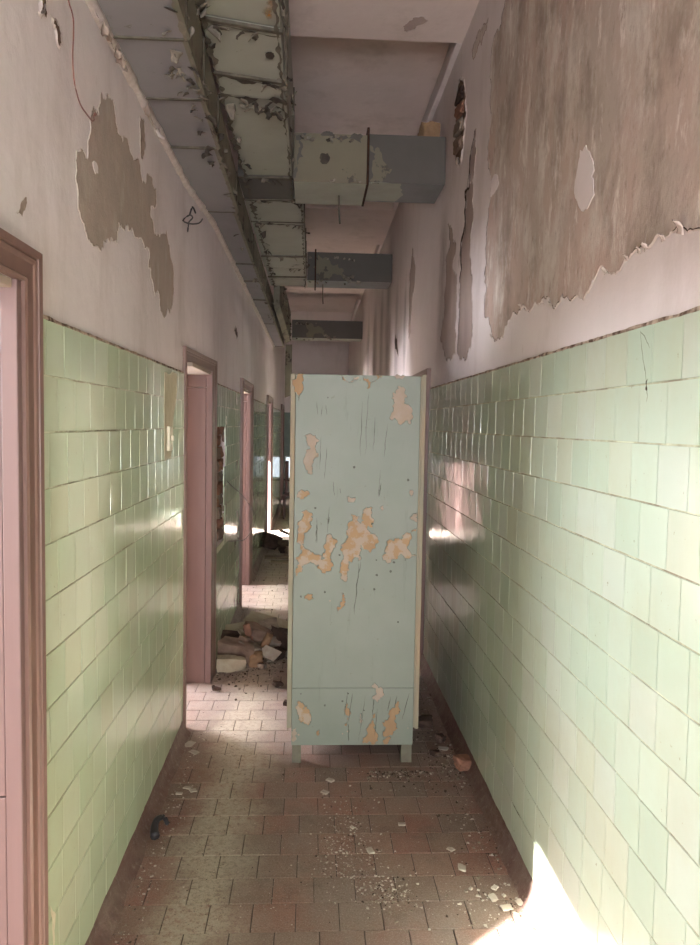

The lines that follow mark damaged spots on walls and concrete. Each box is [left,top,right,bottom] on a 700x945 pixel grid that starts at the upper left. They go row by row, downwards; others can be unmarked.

spalling [38,0,63,50]
peeling [188,2,259,50]
peeling [165,49,200,97]
peeling [190,109,228,167]
peeling [226,82,363,164]
peeling [75,92,174,318]
peeling [440,0,700,363]
spalling [216,416,227,545]